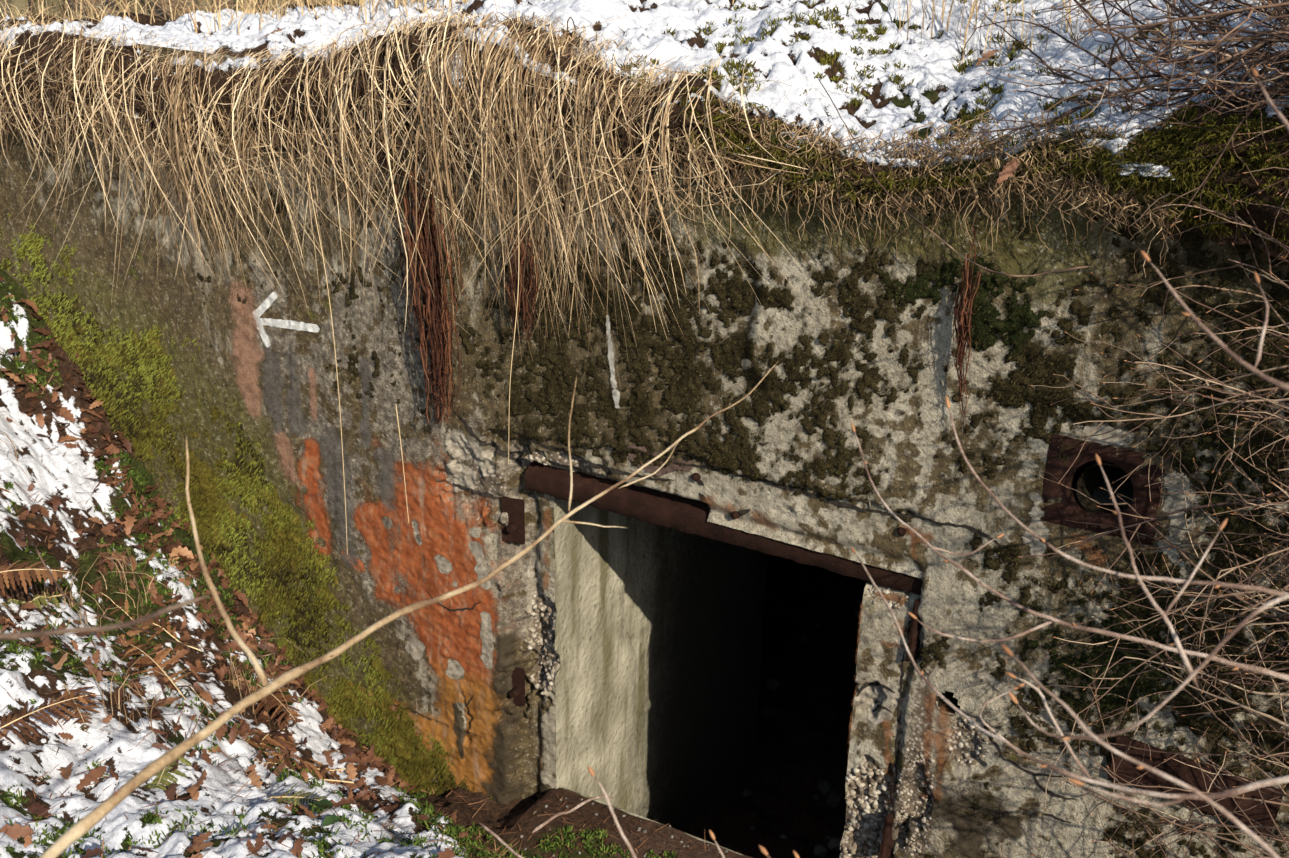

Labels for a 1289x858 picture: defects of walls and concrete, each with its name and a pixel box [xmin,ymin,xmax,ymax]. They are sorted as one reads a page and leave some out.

peeling [297,438,504,796]
spalling [865,586,909,609]
spalling [855,681,900,725]
spalling [946,716,989,764]
spalling [841,739,935,858]